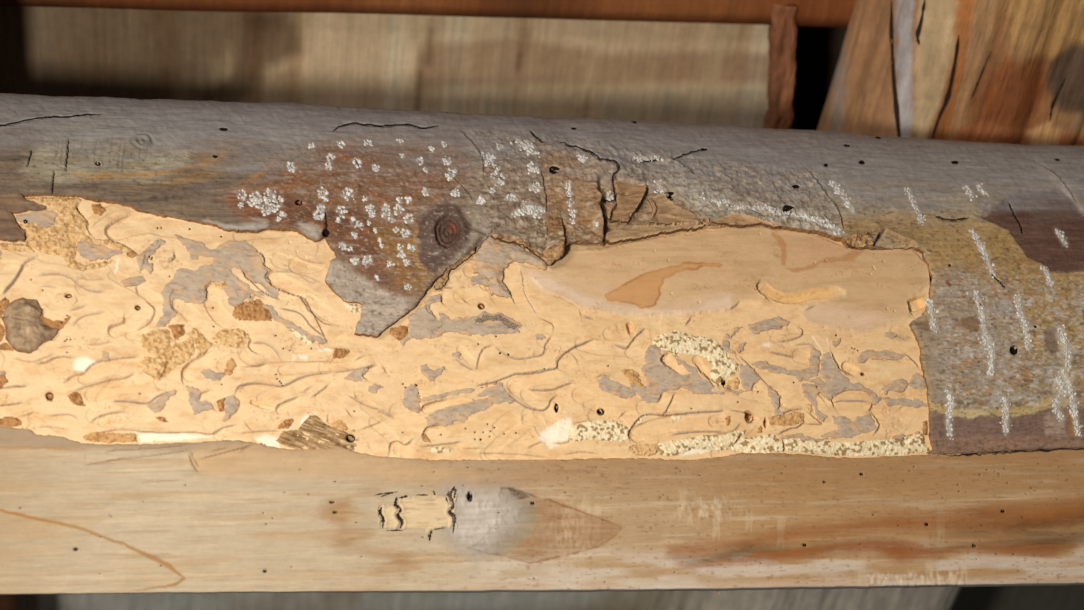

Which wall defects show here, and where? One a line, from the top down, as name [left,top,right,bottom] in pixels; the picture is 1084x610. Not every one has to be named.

crack [0,113,101,194]
crack [333,122,439,131]
peeling [602,177,780,246]
peeling [121,234,327,344]
peeling [402,382,514,426]
peeling [400,237,547,346]
peeling [597,316,1084,454]
damp [944,390,955,440]
damp [966,290,995,377]
damp [969,229,997,278]
damp [1013,294,1033,351]
damp [1052,324,1080,422]